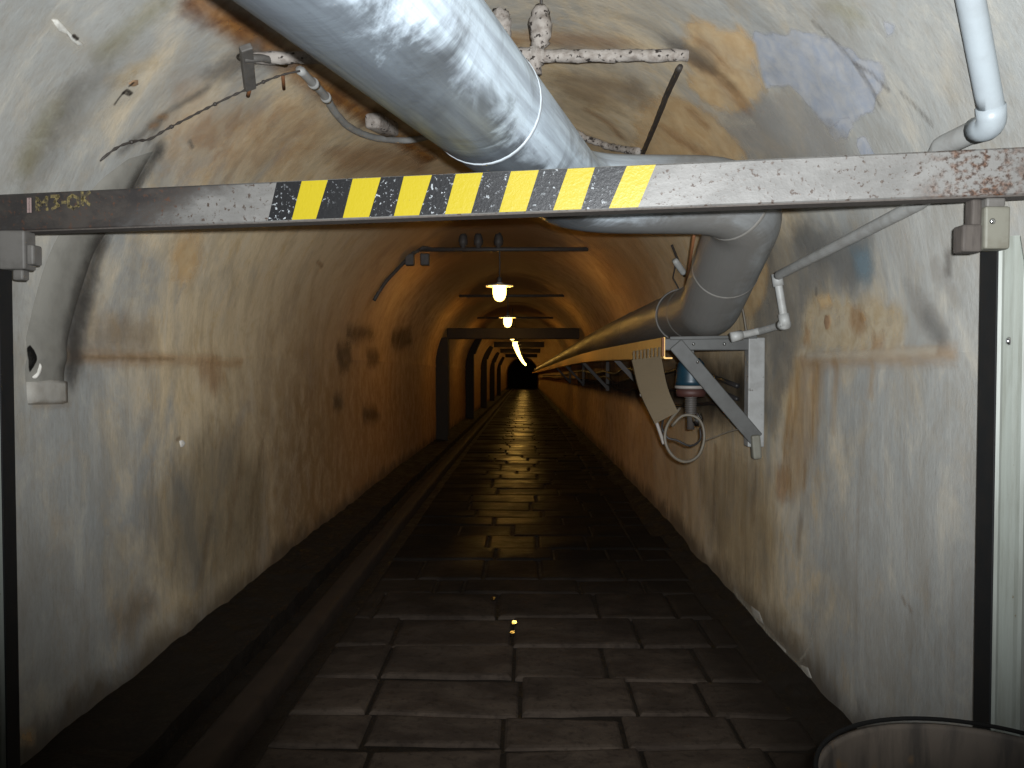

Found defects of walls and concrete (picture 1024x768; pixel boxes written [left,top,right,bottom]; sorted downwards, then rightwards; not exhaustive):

water stain [637,24,756,160]
peeling [751,30,883,155]